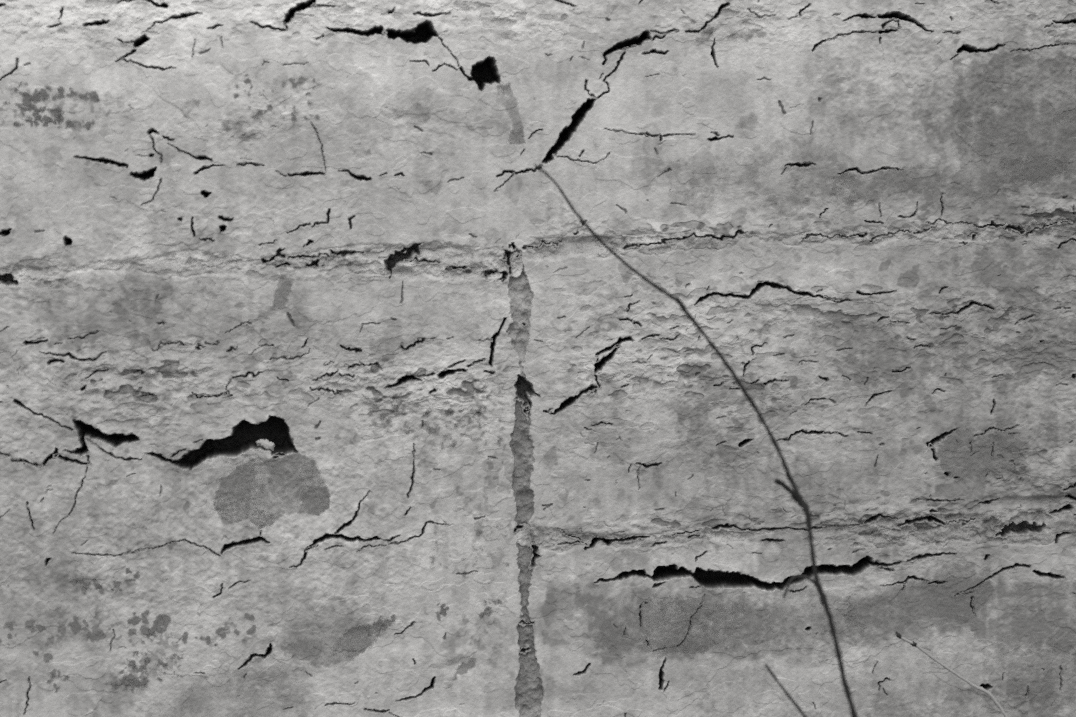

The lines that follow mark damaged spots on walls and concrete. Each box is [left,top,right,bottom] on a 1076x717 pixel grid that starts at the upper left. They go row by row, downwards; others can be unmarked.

crack [47,0,223,71]
crack [250,0,460,68]
crack [811,11,1076,60]
crack [494,2,811,192]
crack [23,330,109,391]
crack [543,281,995,448]
crack [0,399,271,567]
crack [289,443,449,568]
crack [1049,482,1076,544]
crack [212,580,251,598]
crack [556,498,1076,692]